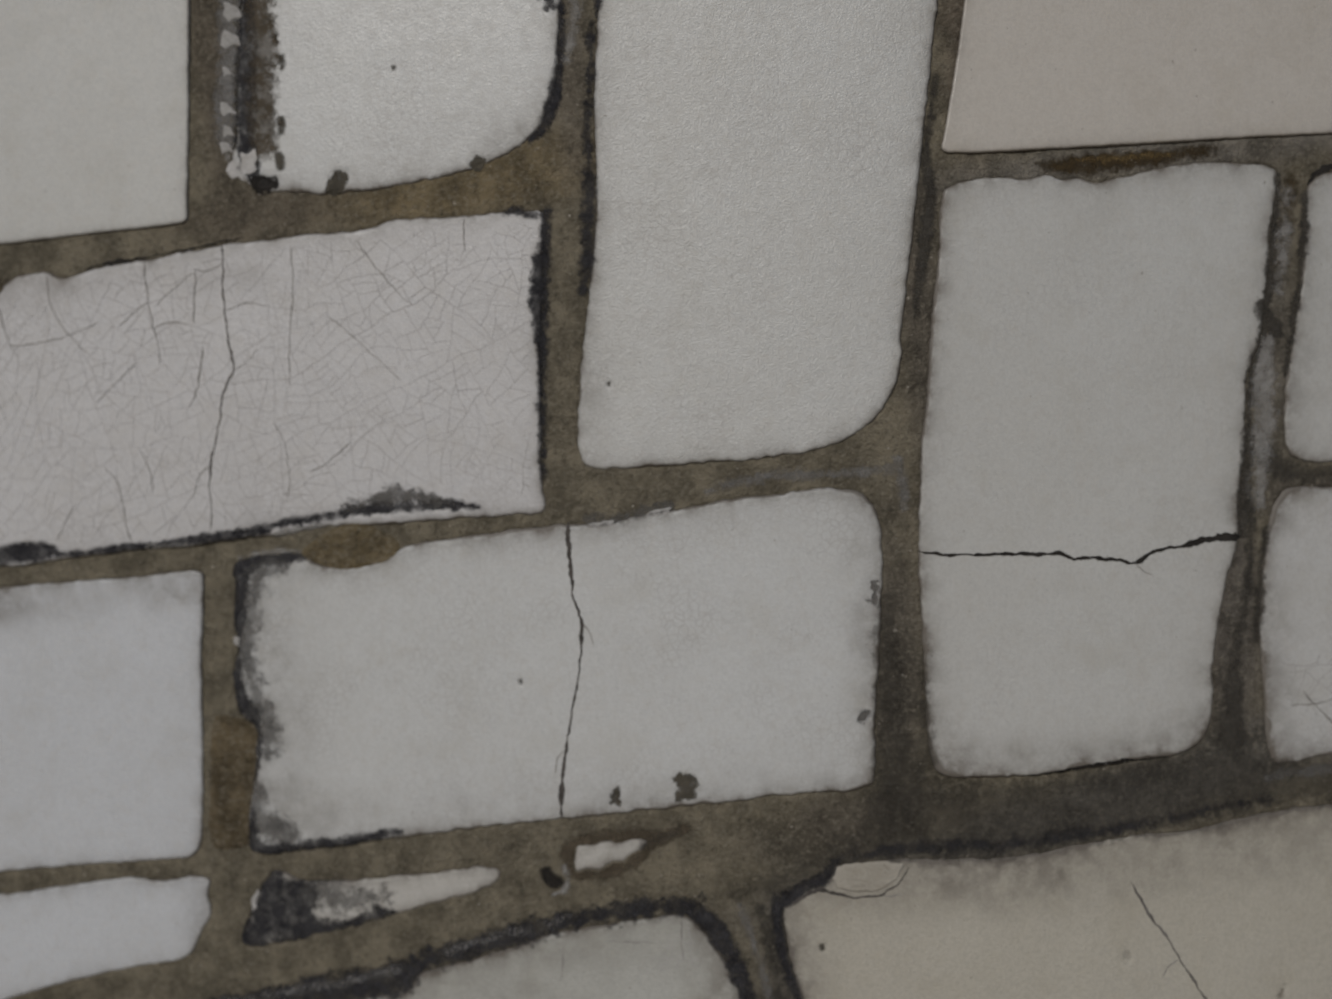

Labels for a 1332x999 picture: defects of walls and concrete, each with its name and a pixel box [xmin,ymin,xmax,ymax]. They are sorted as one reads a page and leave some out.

spalling [212,0,286,195]
corrosion [1041,144,1218,176]
crack [0,222,532,543]
spalling [0,484,480,565]
crack [918,532,1241,575]
spalling [233,552,403,855]
crack [555,522,594,818]
spalling [242,871,396,947]
crack [1131,882,1207,999]